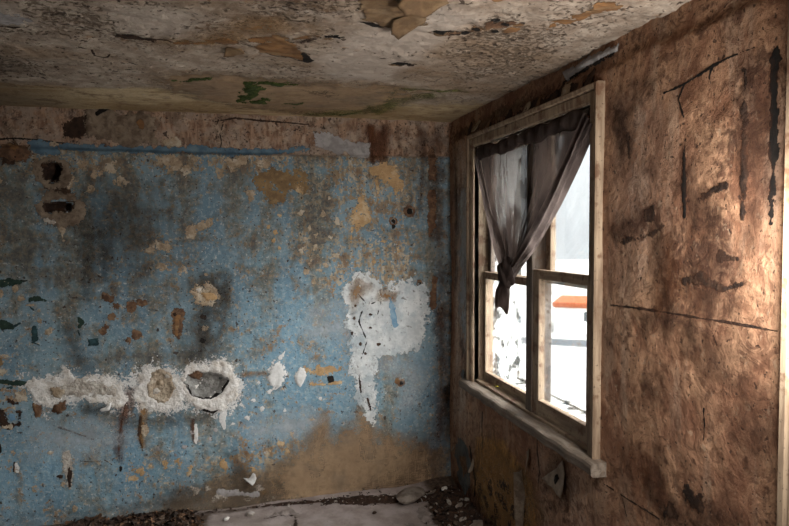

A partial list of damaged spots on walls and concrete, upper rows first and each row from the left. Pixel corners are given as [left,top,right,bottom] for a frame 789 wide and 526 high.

spalling [0,109,404,244]
damp [157,73,412,114]
spalling [255,38,317,63]
peeling [358,0,449,40]
damp [681,139,729,229]
crack [663,47,755,118]
damp [739,46,783,225]
spalling [171,308,186,339]
spalling [189,273,221,343]
spalling [298,223,434,427]
spalling [0,353,295,505]
damp [154,411,437,512]